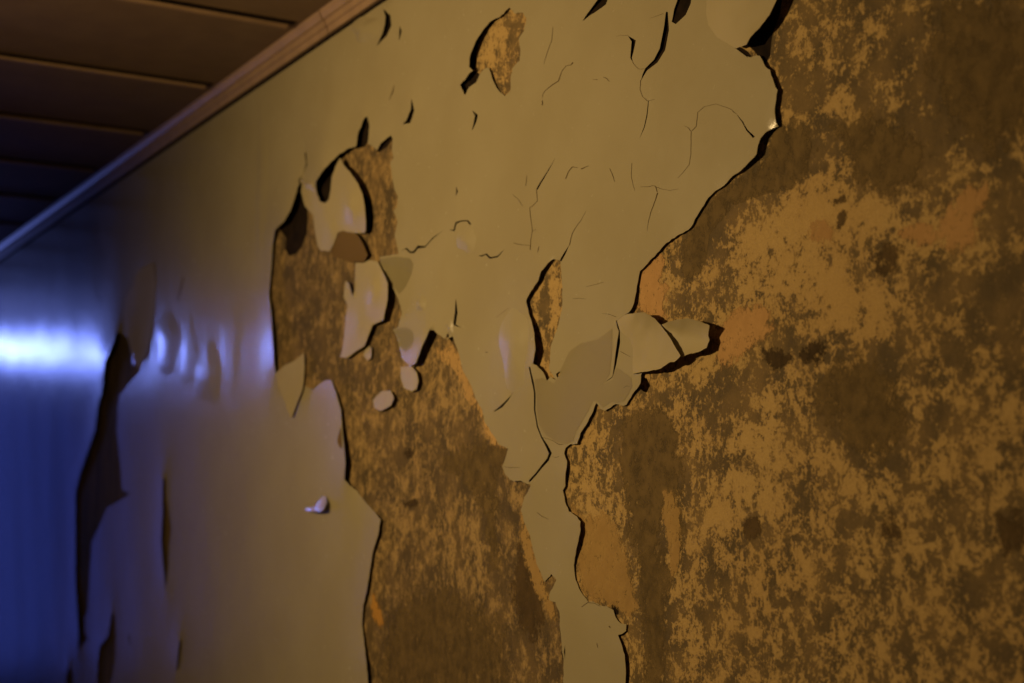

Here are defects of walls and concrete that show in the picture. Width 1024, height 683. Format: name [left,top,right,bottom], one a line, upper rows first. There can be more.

peeling [461,8,526,95]
crack [620,0,691,130]
crack [402,220,471,253]
crack [479,104,755,261]
peeling [269,139,564,683]
peeling [563,0,1024,683]
leakage [762,341,908,466]
leakage [619,402,686,683]
leakage [743,516,761,541]